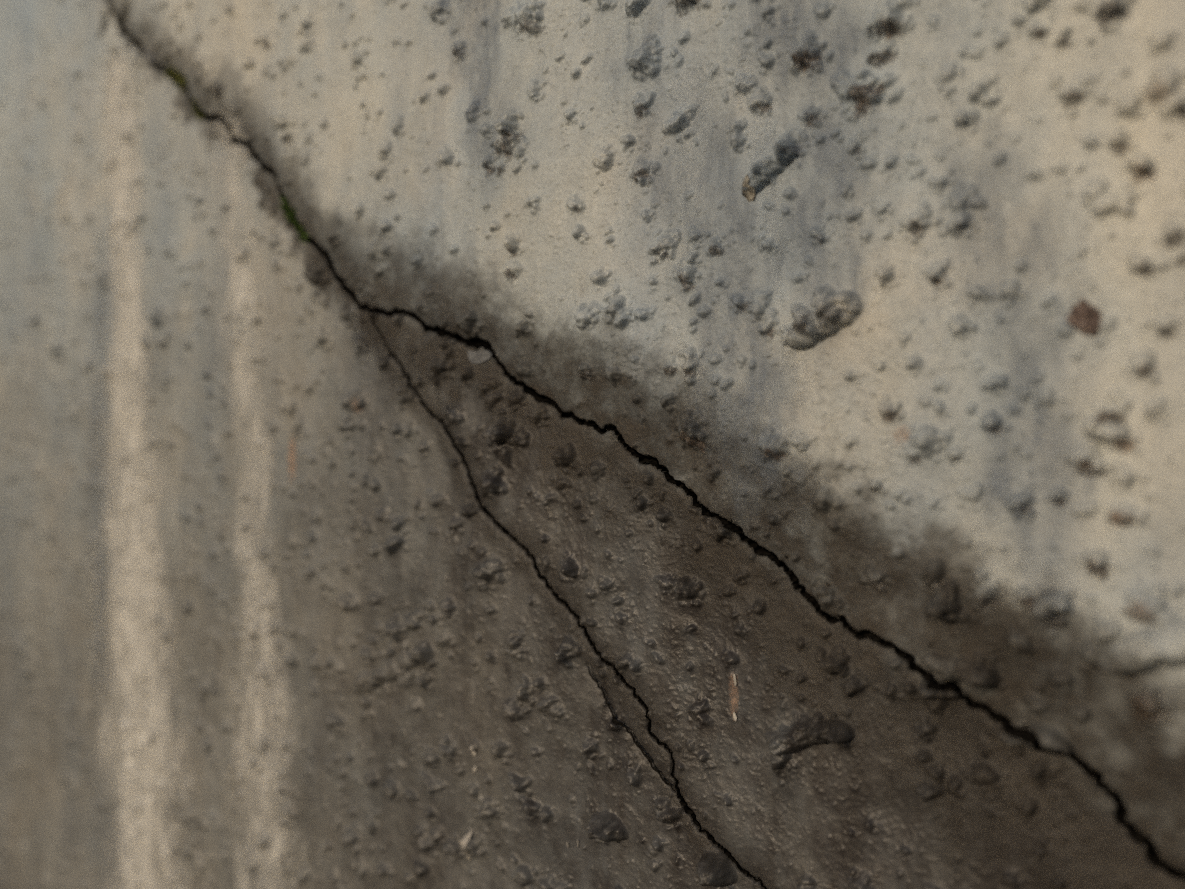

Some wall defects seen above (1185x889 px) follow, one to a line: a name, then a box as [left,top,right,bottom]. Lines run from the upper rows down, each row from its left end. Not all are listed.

crack [98,0,296,230]
crack [310,237,1185,889]